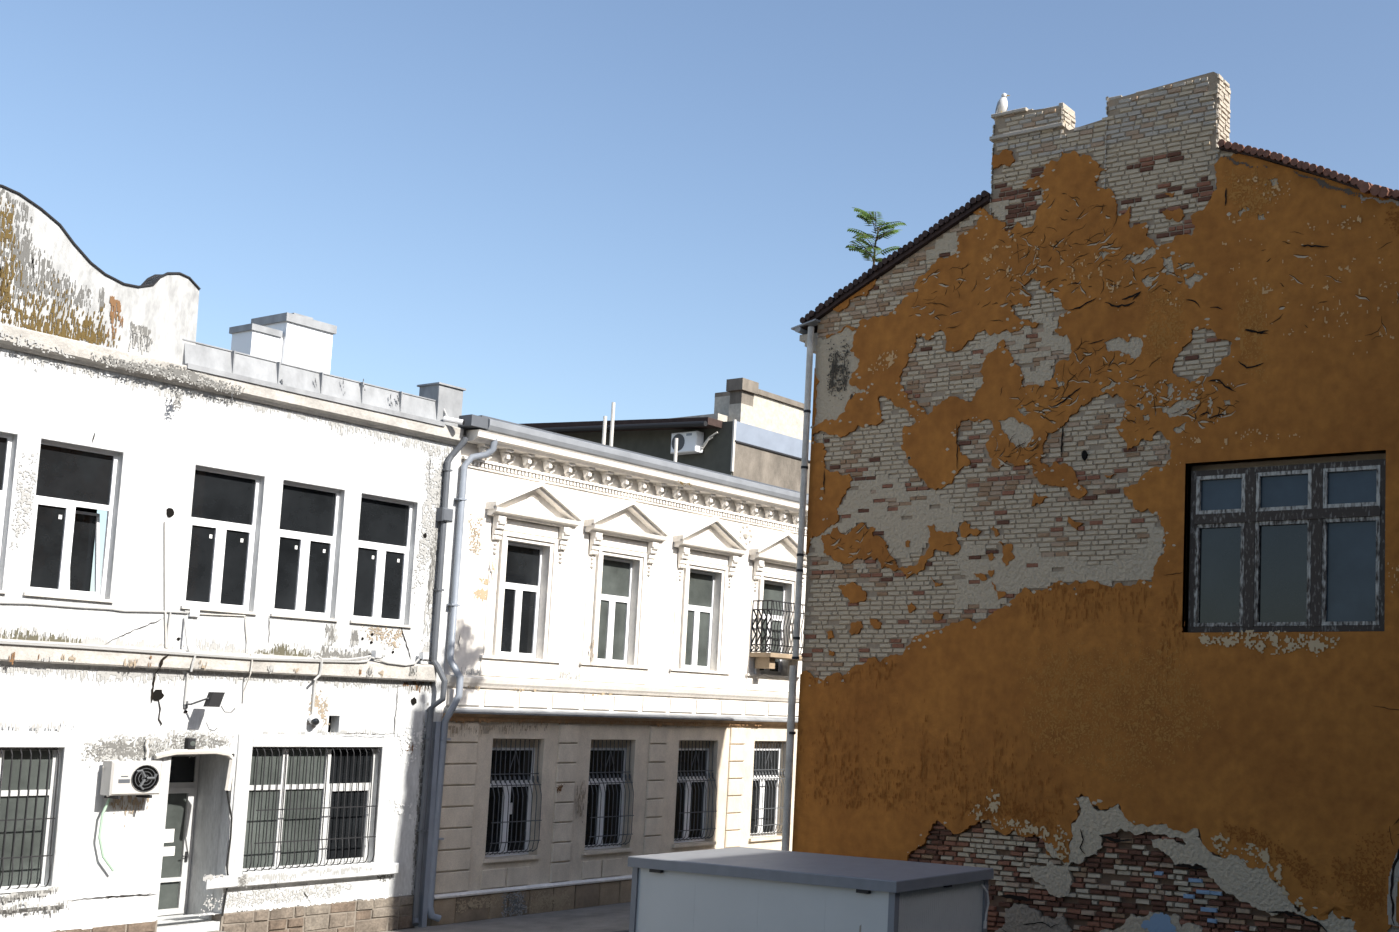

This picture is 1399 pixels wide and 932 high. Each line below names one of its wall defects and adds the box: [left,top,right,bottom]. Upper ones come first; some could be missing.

peeling [1229,205,1398,339]
flaking render [801,72,1245,686]
peeling [1198,630,1340,657]
damp [0,885,156,932]
spalling [907,789,1322,932]
crack [1389,819,1399,924]